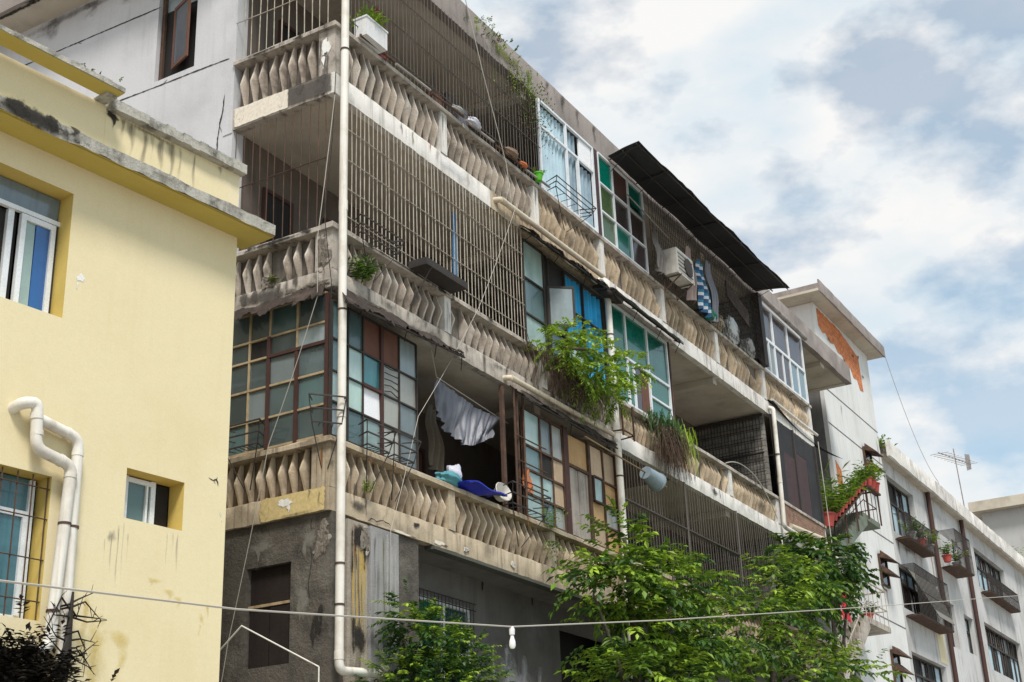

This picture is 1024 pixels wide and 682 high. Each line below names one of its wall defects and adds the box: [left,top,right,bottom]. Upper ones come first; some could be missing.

mould [1,97,89,146]
crack [216,95,225,149]
flaking render [816,308,864,392]
peeling [259,486,332,559]
leakage [352,525,366,572]
leakage [352,618,366,652]